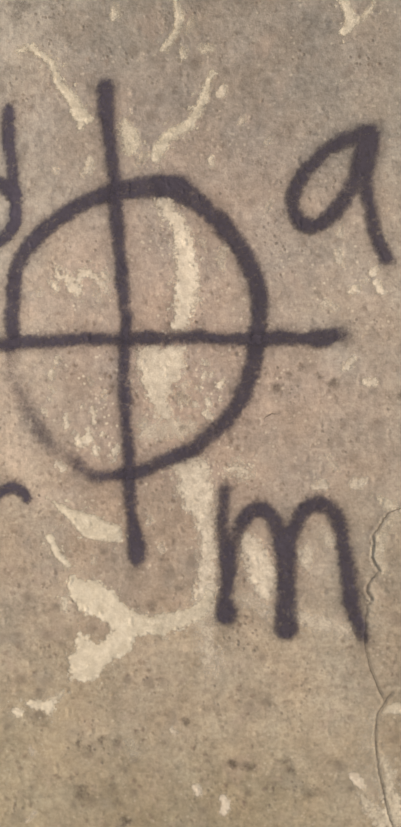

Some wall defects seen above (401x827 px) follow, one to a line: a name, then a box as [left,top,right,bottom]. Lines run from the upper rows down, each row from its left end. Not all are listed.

crack [364,508,401,827]